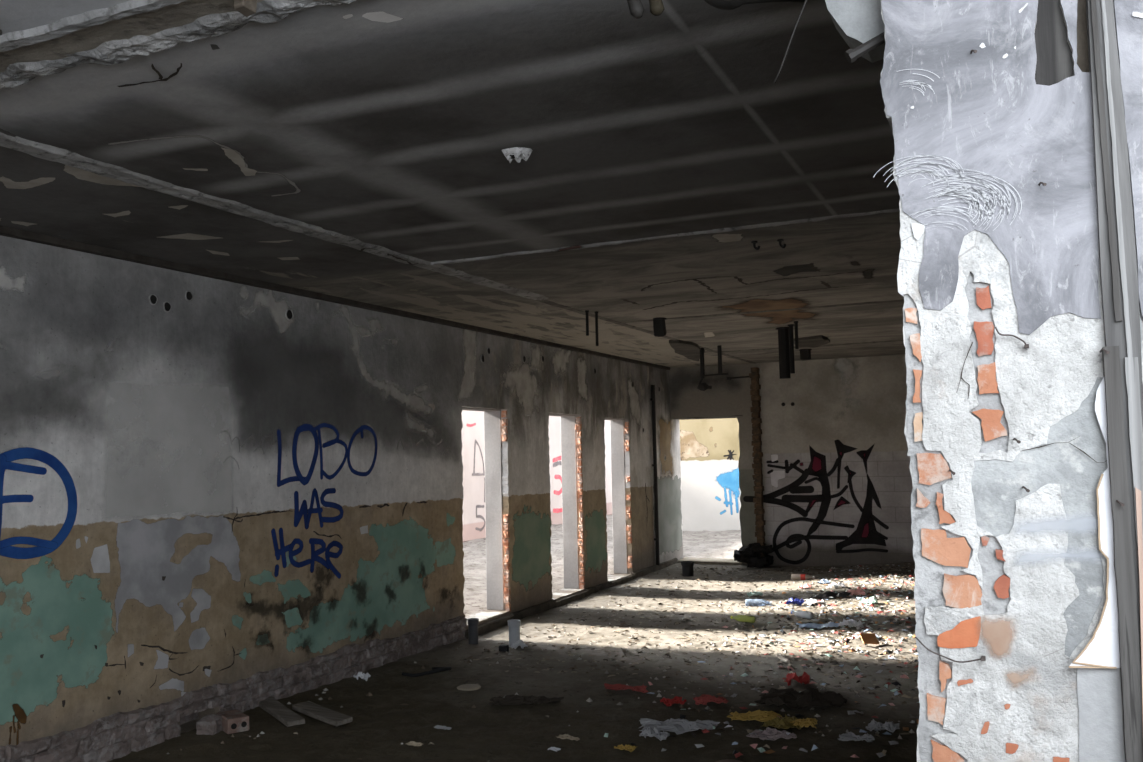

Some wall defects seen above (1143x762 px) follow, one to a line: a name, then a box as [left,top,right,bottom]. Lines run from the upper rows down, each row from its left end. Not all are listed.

spalling [0,0,403,89]
peeling [0,165,140,189]
peeling [157,233,230,256]
peeling [912,223,925,240]
flaking render [0,266,26,291]
flaking render [903,272,1126,762]
peeling [243,513,456,653]
peeling [0,536,115,725]
peeling [189,589,211,650]
peeling [127,644,186,697]